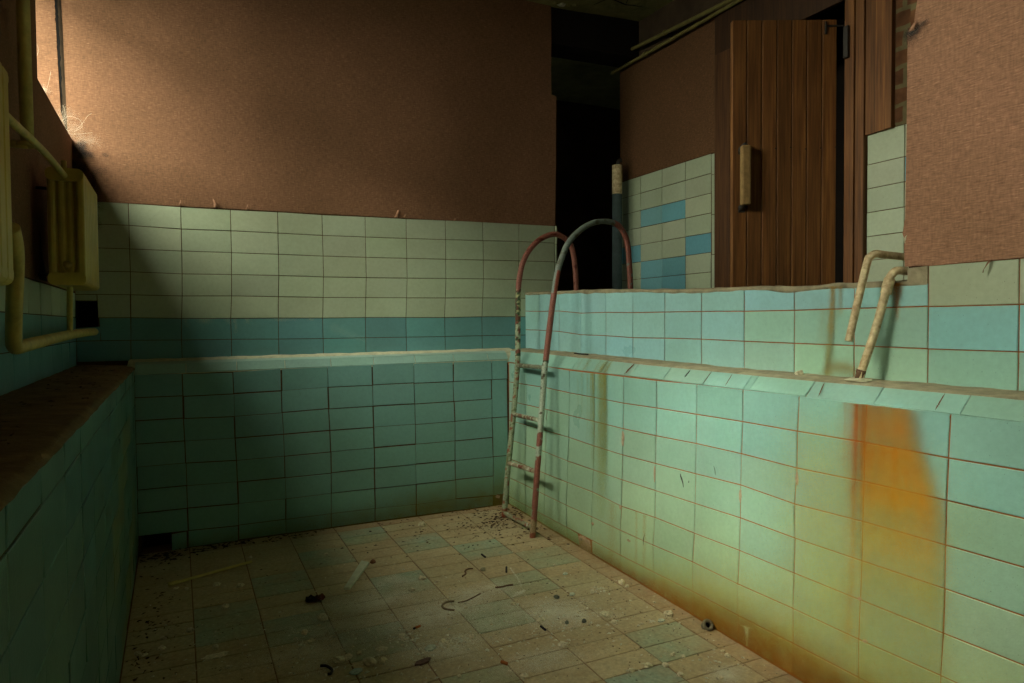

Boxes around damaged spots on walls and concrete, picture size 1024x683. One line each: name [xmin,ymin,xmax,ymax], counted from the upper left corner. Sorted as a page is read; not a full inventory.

rust [508,487,1024,683]